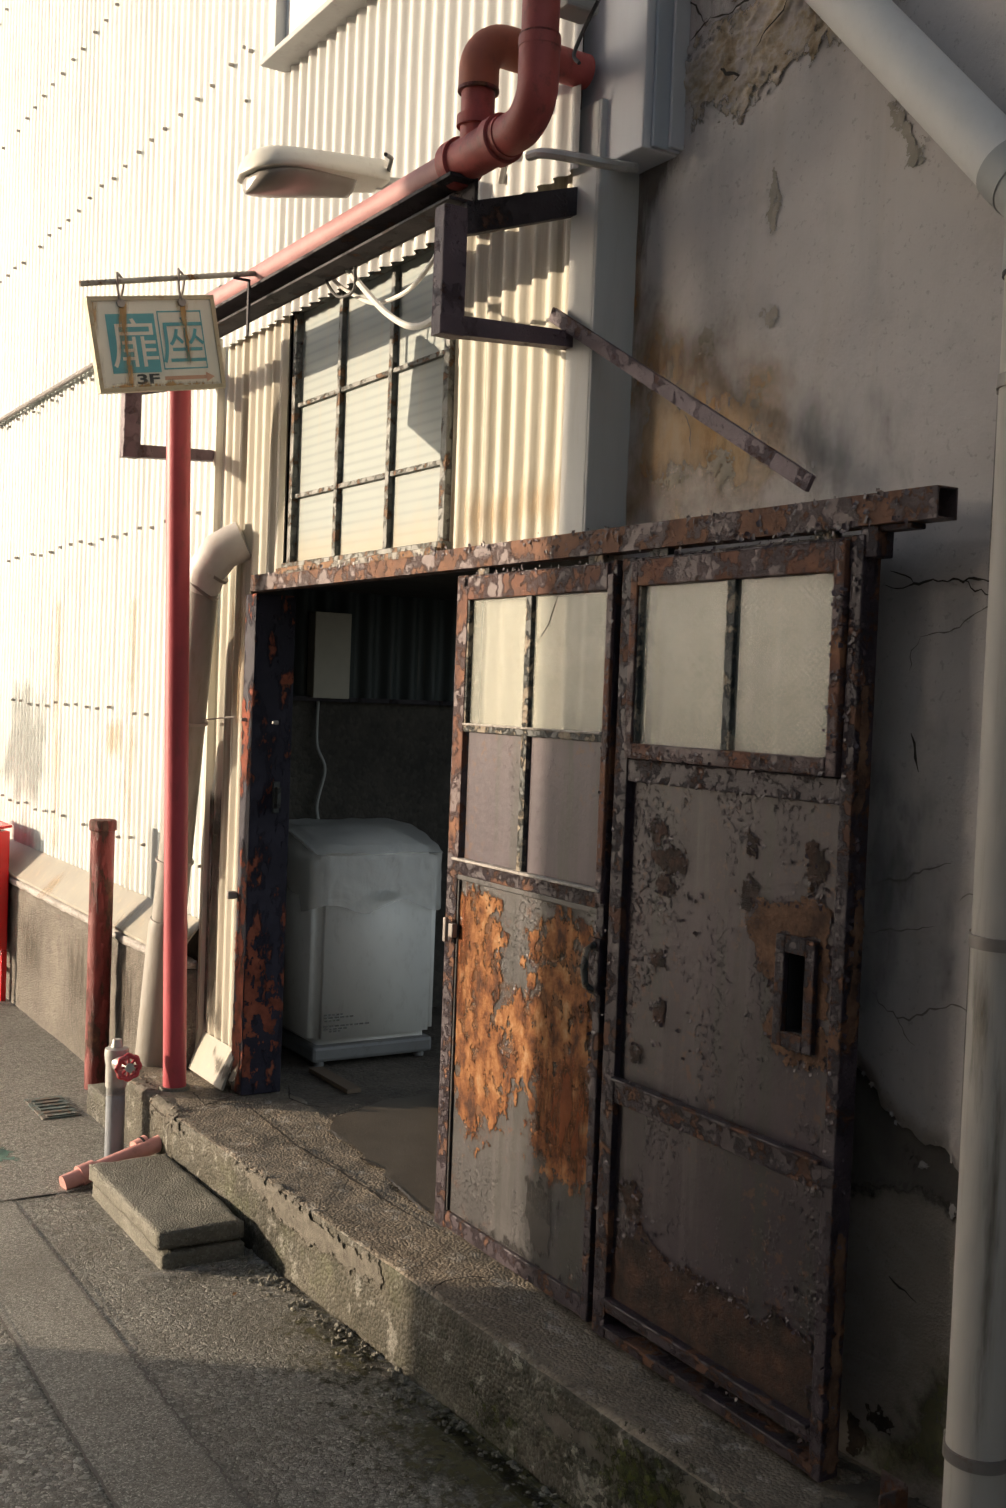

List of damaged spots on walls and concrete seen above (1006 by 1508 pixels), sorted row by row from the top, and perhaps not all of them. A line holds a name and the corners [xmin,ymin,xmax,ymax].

flaking render [684,0,845,132]
flaking render [887,100,930,168]
crack [886,571,989,668]
corrosion [240,698,251,787]
corrosion [648,818,688,900]
corrosion [231,847,283,1090]
corrosion [454,883,594,1198]
peeling [233,487,932,1443]
crack [872,992,967,1046]
flaking render [851,1062,959,1219]
damp [263,1259,754,1508]
spalling [846,1402,895,1457]